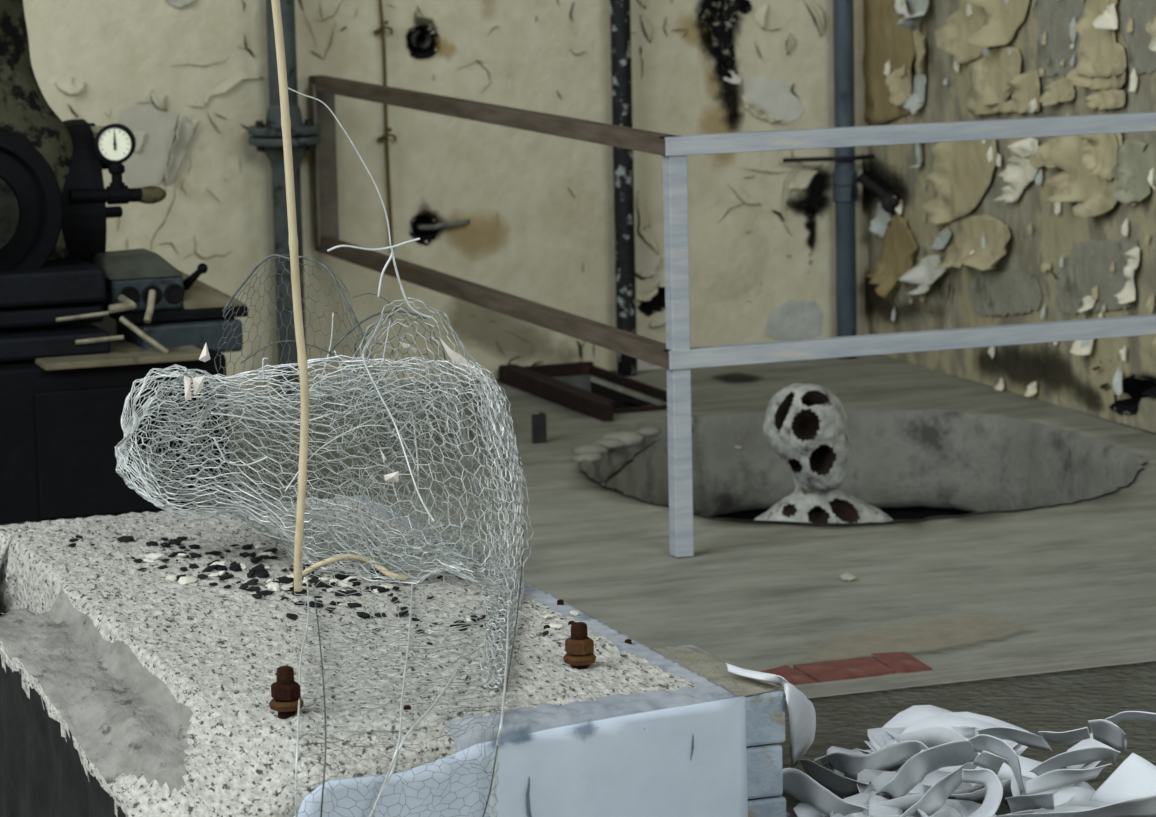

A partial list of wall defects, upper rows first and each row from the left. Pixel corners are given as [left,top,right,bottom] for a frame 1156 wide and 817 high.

crack [56,0,263,134]
peeling [862,0,1156,124]
flaking render [118,103,178,187]
crack [118,157,241,259]
peeling [866,133,1156,316]
peeling [1070,339,1094,356]
peeling [1025,382,1037,397]
spalling [1109,374,1156,415]
spalling [143,548,191,563]
spalling [165,561,226,585]
spalling [254,544,397,606]